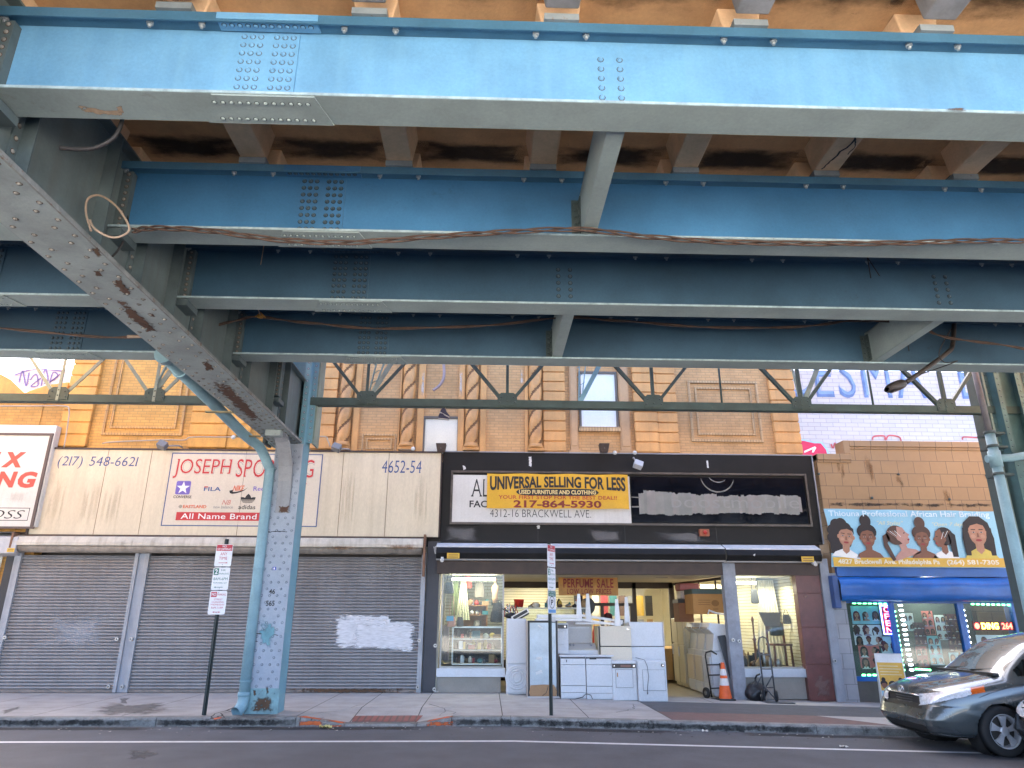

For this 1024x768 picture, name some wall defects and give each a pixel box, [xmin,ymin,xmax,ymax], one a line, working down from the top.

crack [822,138,856,169]
rust [118,301,156,332]
rust [203,362,262,423]
rust [253,687,271,711]